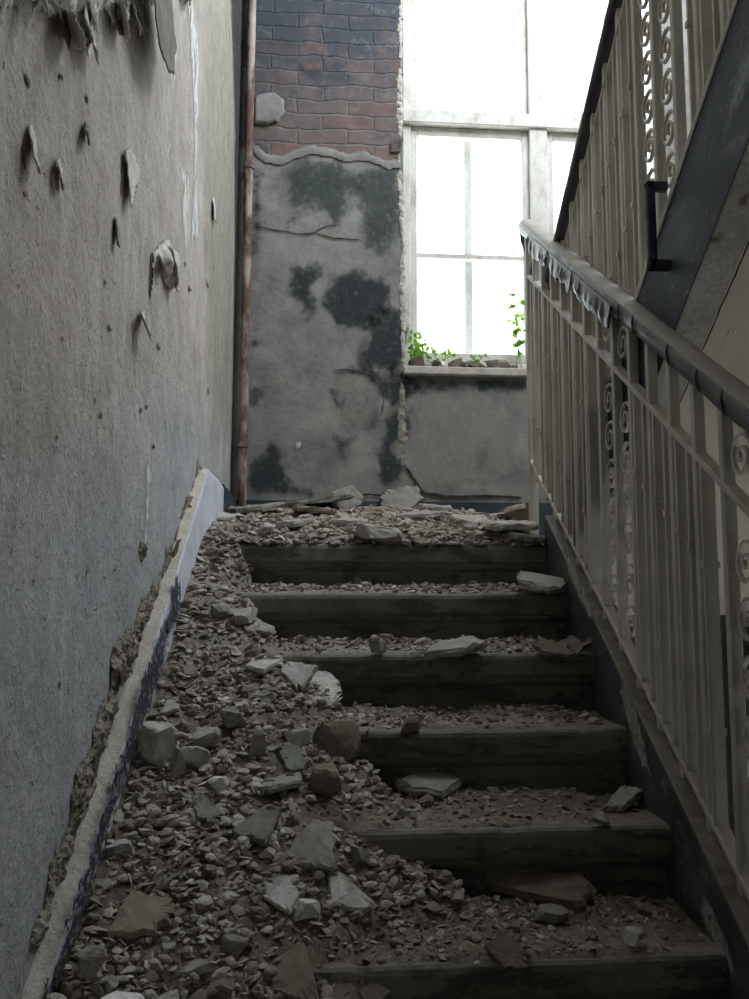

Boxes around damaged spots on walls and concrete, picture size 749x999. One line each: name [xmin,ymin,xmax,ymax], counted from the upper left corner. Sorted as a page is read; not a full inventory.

peeling [0,0,192,75]
peeling [23,124,41,175]
peeling [121,148,139,208]
crack [253,224,359,240]
flaking render [240,0,406,363]
mould [288,156,399,252]
peeling [149,239,192,300]
leakage [290,267,457,485]
leakage [476,380,523,391]
mould [250,444,313,496]
spalling [30,460,203,999]